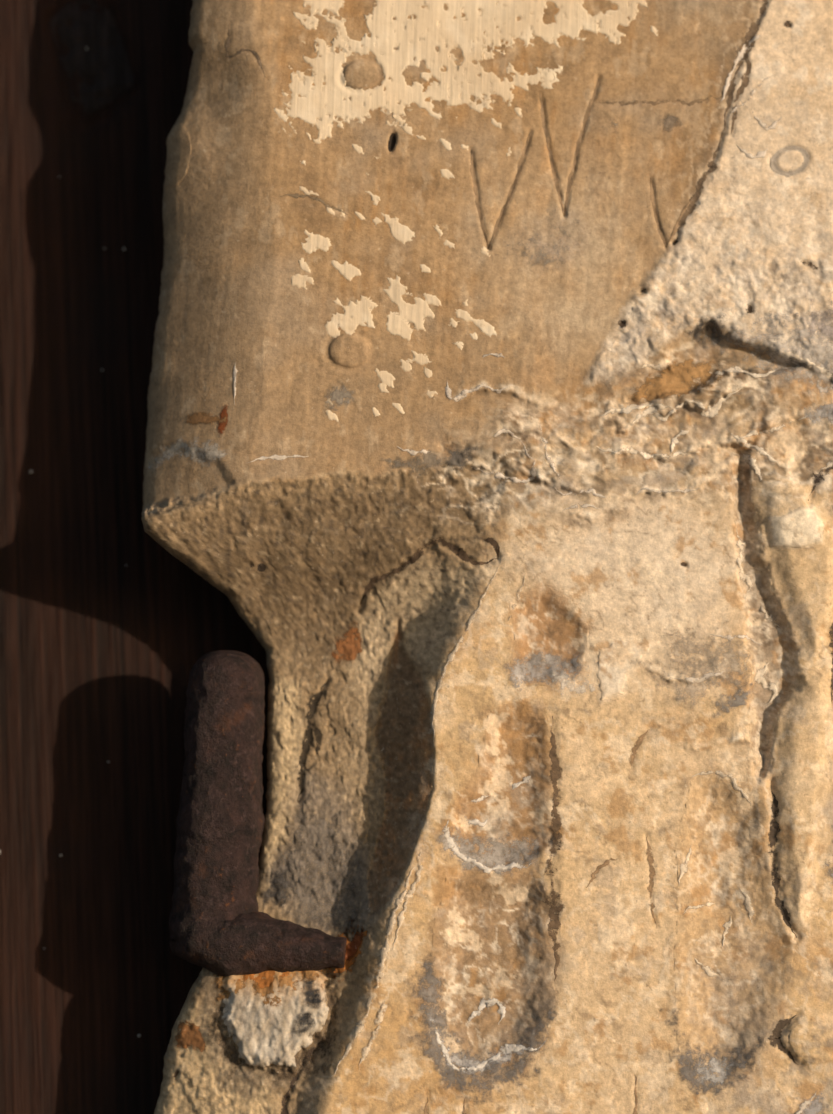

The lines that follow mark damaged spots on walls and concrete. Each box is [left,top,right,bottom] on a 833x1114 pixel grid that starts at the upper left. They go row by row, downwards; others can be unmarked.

peeling [274,0,649,159]
crack [600,0,768,239]
peeling [291,229,361,290]
peeling [326,191,415,244]
peeling [325,275,442,414]
corrosion [187,406,228,434]
crack [358,537,500,613]
corrosion [332,622,363,662]
crack [297,683,326,803]
crack [544,716,617,981]
crack [768,781,797,938]
corrosion [215,917,367,1006]